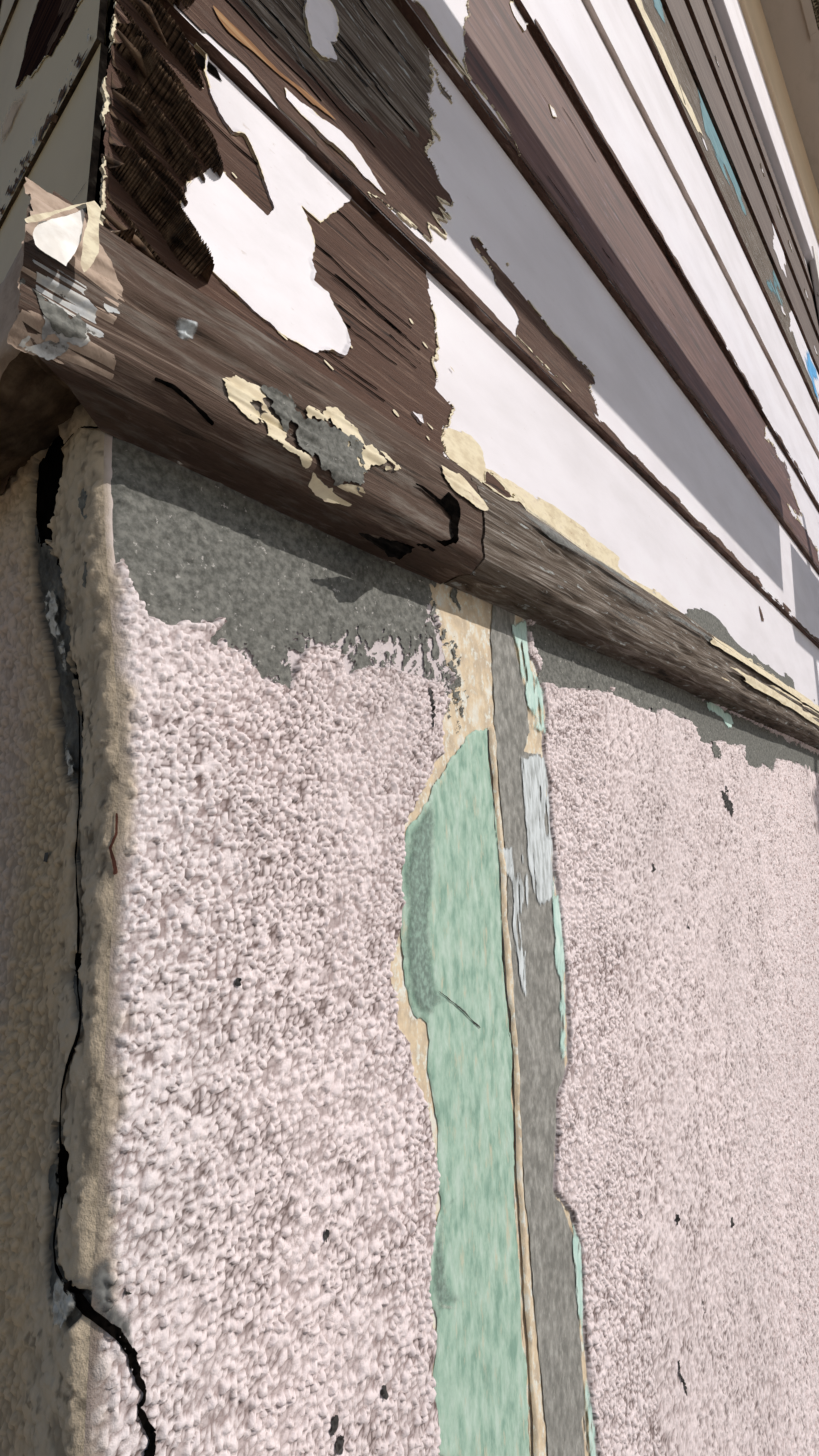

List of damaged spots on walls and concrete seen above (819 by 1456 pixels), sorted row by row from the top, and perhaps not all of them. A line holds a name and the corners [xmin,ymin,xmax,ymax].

crack [36,426,98,568]
peeling [7,0,819,726]
flaking render [35,525,83,802]
flaking render [73,973,83,1014]
crack [53,662,156,1456]
peeling [111,437,819,1456]
flaking render [48,1164,92,1328]